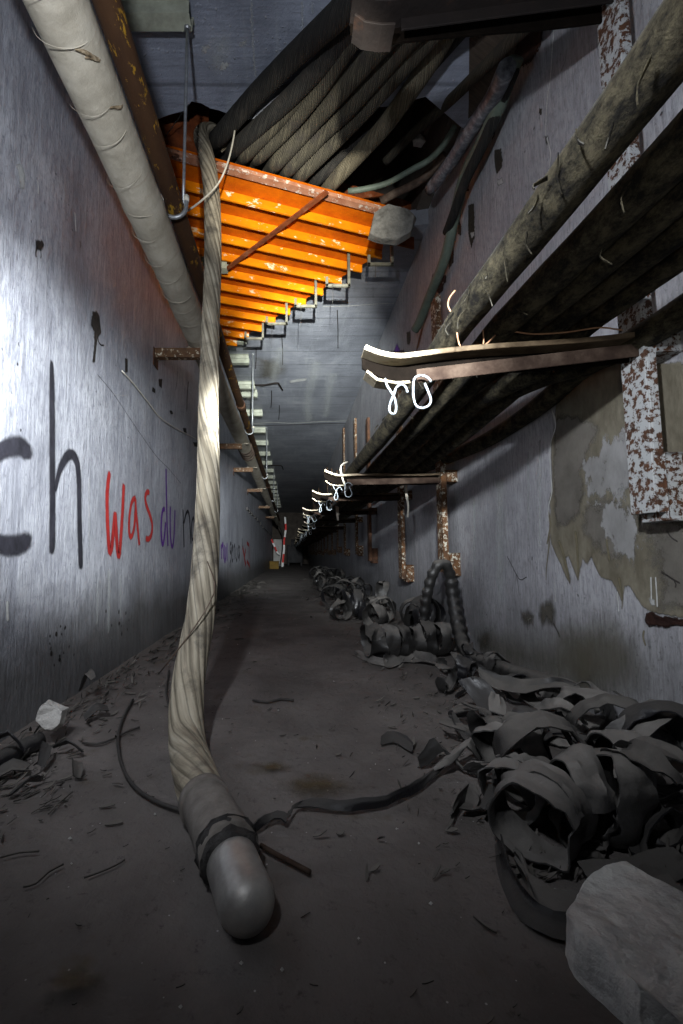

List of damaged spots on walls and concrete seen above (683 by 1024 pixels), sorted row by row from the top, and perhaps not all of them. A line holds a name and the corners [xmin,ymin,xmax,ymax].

peeling [546,361,683,618]
corrosion [642,599,683,646]